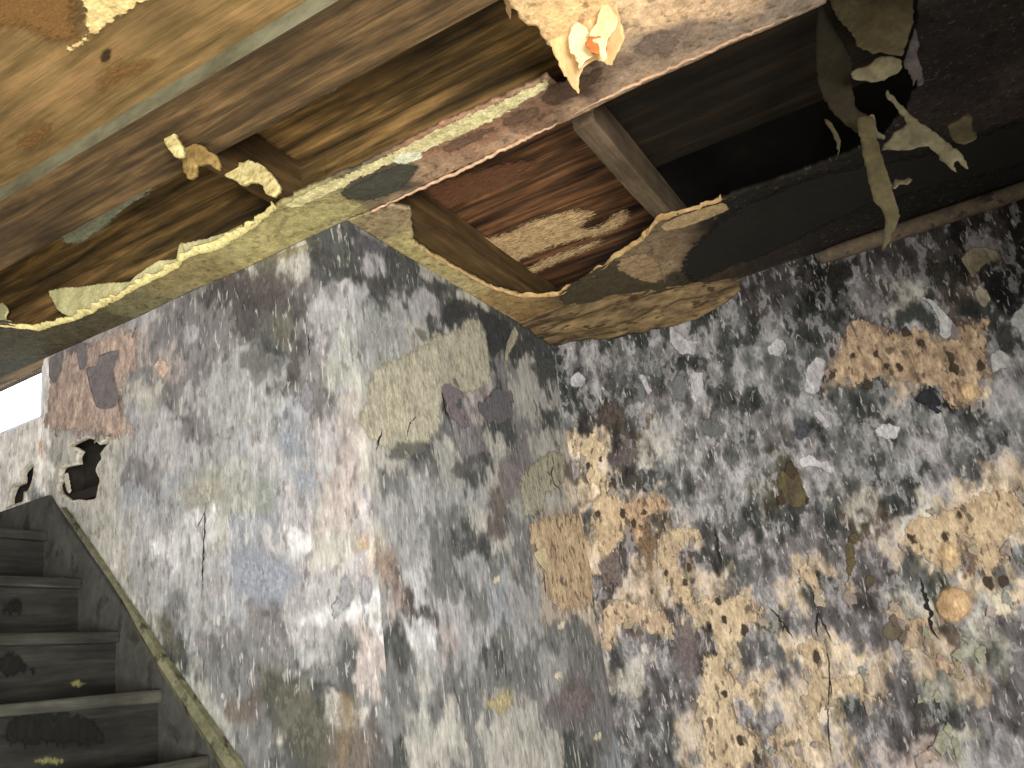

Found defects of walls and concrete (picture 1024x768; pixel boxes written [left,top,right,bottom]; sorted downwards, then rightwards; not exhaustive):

peeling [393,151,423,164]
peeling [43,327,138,504]
peeling [359,318,514,459]
peeling [669,327,697,355]
peeling [804,247,1012,414]
spalling [6,461,35,509]
crack [197,502,206,598]
peeling [520,426,880,768]
crack [767,590,833,762]
crack [920,578,939,639]
peeling [879,600,987,682]
peeling [898,484,1024,618]